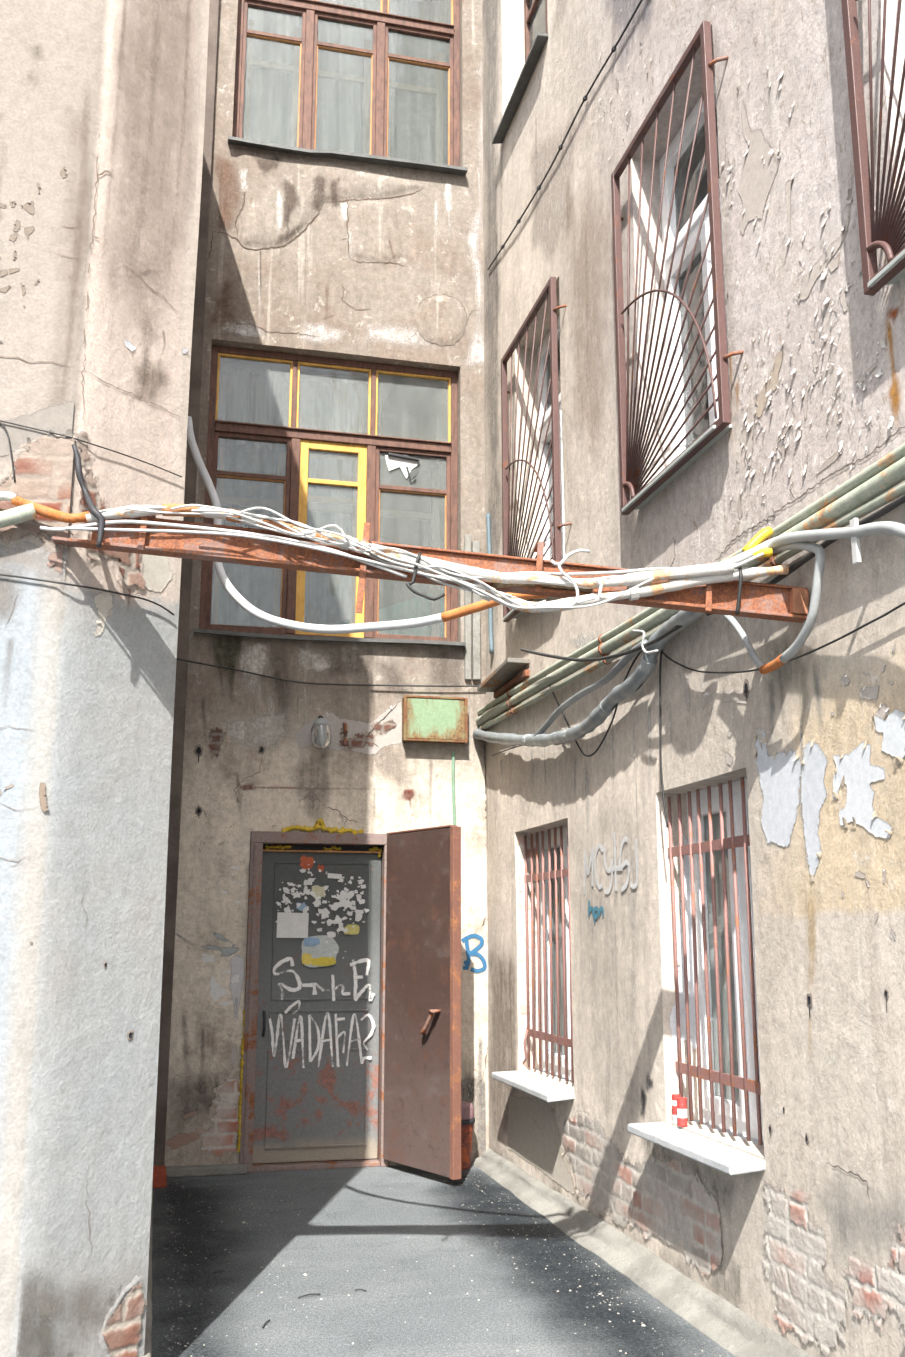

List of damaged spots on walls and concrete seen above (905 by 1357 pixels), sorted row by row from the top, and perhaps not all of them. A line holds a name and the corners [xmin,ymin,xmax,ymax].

water stain [217,156,279,227]
water stain [277,184,300,238]
water stain [314,177,351,242]
water stain [435,183,452,221]
peeling [730,166,894,528]
corrosion [888,309,899,409]
flaking render [0,428,146,595]
flaking render [295,702,402,755]
peeling [754,643,905,882]
flaking render [507,1095,723,1278]
flaking render [97,1274,148,1357]
flaking render [762,1175,905,1357]